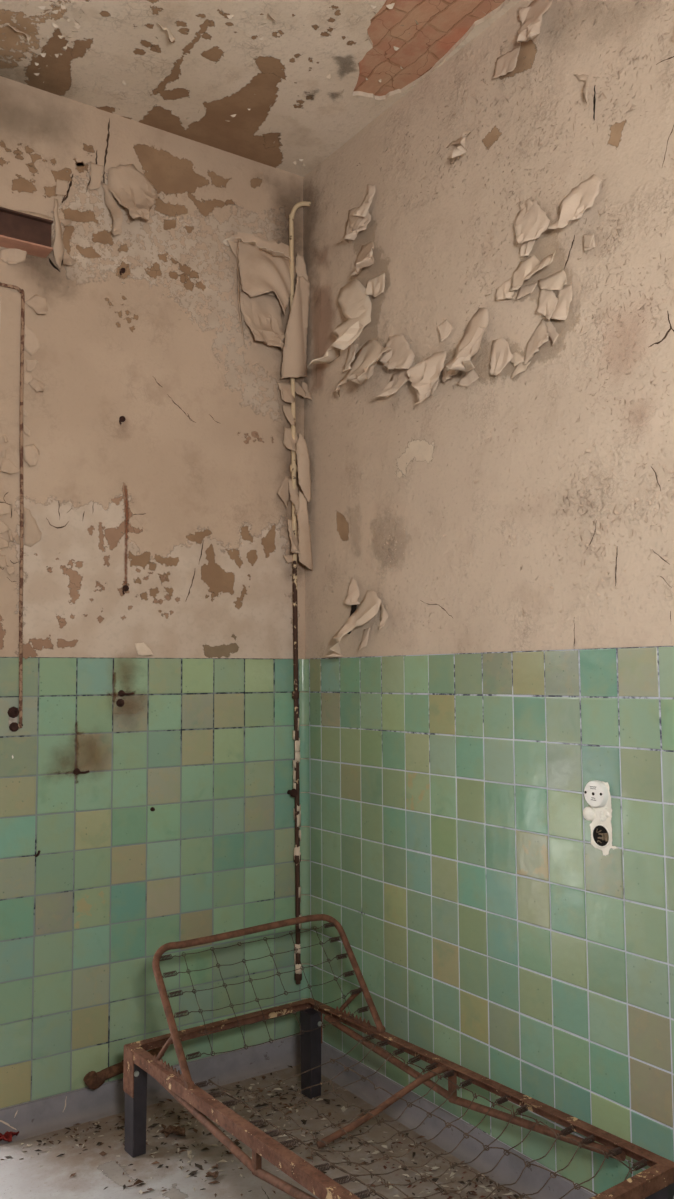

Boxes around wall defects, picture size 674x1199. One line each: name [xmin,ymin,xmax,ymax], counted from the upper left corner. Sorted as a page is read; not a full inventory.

peeling [0,0,93,96]
spalling [312,0,505,96]
peeling [492,0,553,80]
peeling [97,0,319,188]
peeling [446,126,502,158]
flaking render [608,120,626,148]
crack [649,311,674,347]
peeling [0,141,602,659]
crack [589,521,618,586]